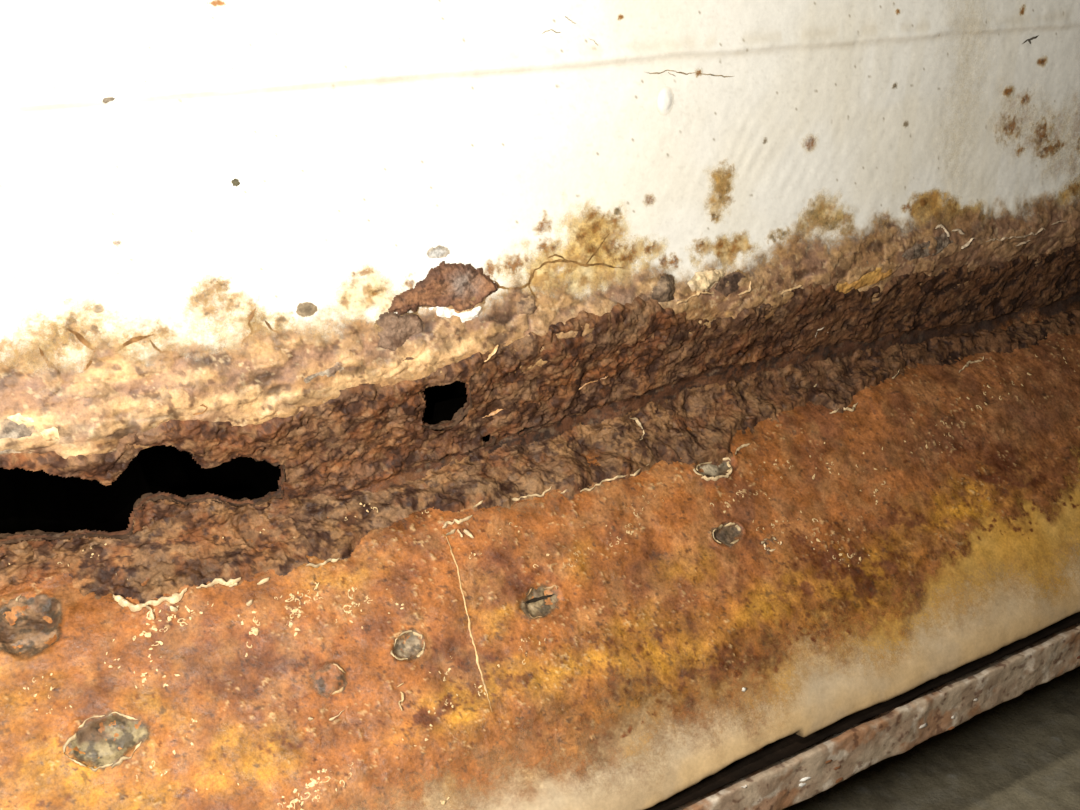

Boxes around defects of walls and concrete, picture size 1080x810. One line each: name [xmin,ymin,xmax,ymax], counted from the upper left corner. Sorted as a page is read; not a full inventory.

corrosion [0,112,1080,459]
spalling [0,220,1080,688]
corrosion [0,309,1080,810]
crack [490,233,625,297]